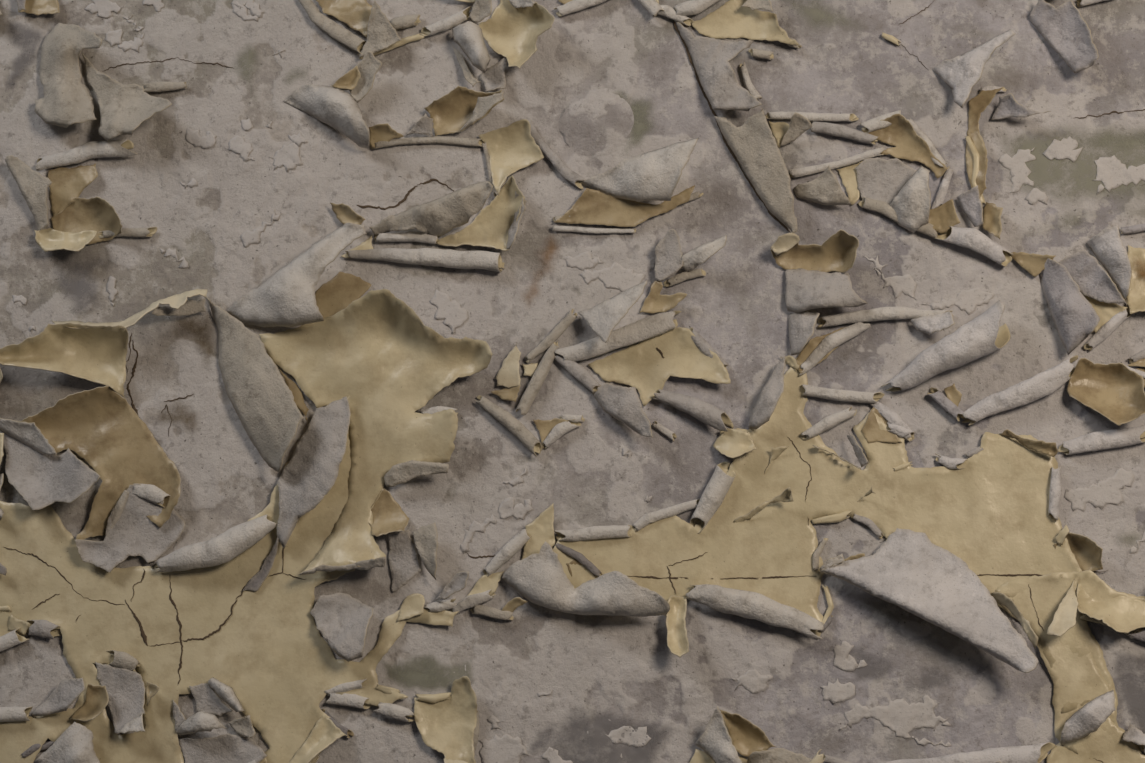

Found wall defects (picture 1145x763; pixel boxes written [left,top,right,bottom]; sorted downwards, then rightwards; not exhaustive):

crack [1075,109,1145,119]
crack [357,178,454,210]
peeling [0,0,704,592]
peeling [397,0,1145,673]
crack [789,438,812,526]
crack [5,547,245,685]
crack [629,552,801,594]
crack [975,573,1044,631]
peeling [0,650,160,763]
peeling [289,676,528,763]
peeling [695,706,853,763]
flaking render [821,641,1116,763]